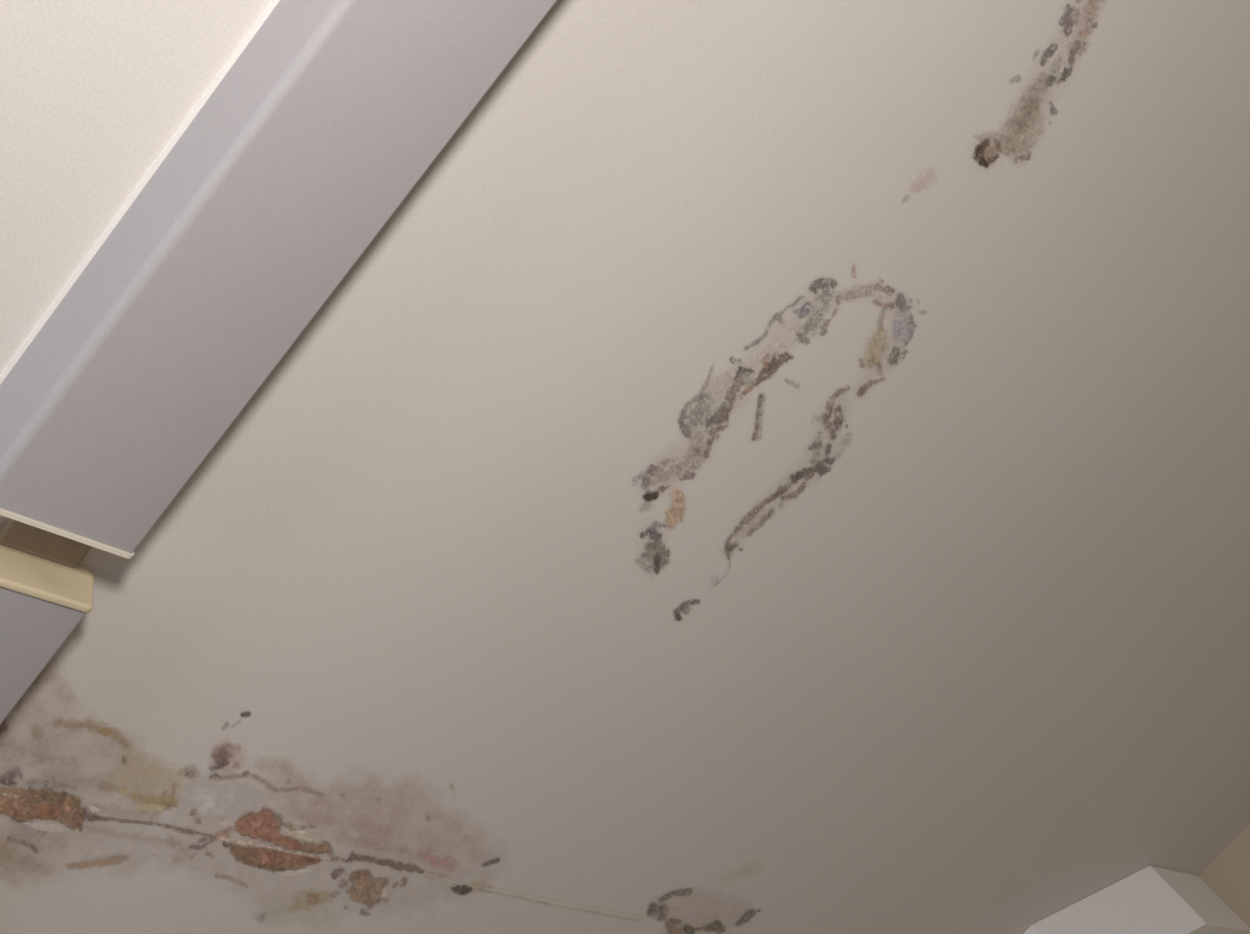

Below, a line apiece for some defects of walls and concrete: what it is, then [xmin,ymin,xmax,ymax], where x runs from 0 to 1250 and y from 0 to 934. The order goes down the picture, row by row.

peeling [633,264,916,574]
peeling [674,600,700,621]
damp [118,745,297,823]
crack [97,817,212,837]
crack [347,853,499,895]
peeling [647,889,760,934]